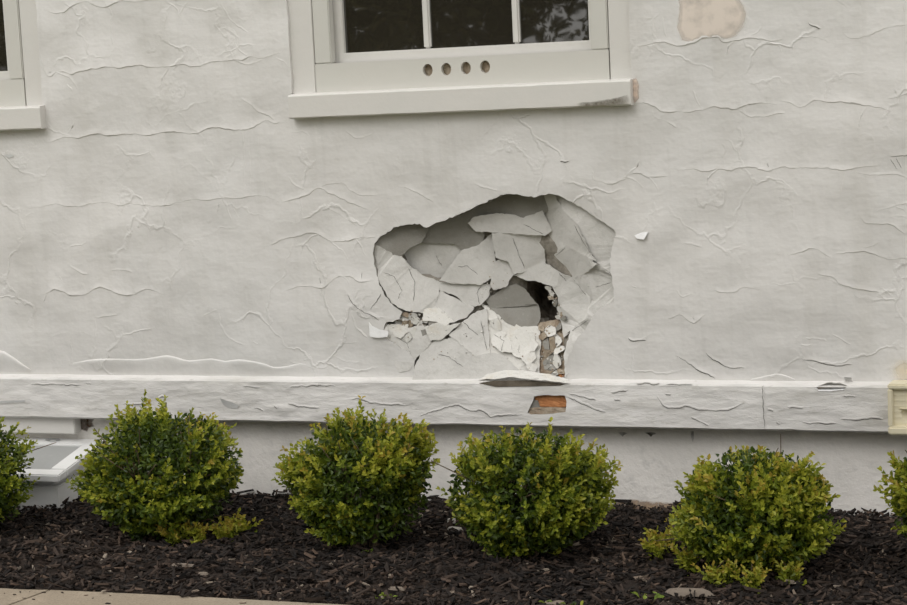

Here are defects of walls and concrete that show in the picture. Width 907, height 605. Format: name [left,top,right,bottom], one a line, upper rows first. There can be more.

crack [40,3,290,91]
crack [635,17,783,55]
crack [43,97,289,145]
crack [635,82,907,128]
crack [592,148,907,193]
crack [268,176,435,338]
spalling [369,194,616,414]
crack [628,335,646,343]
crack [799,334,853,366]
crack [30,380,92,388]
crack [288,383,521,418]
crack [566,352,883,428]